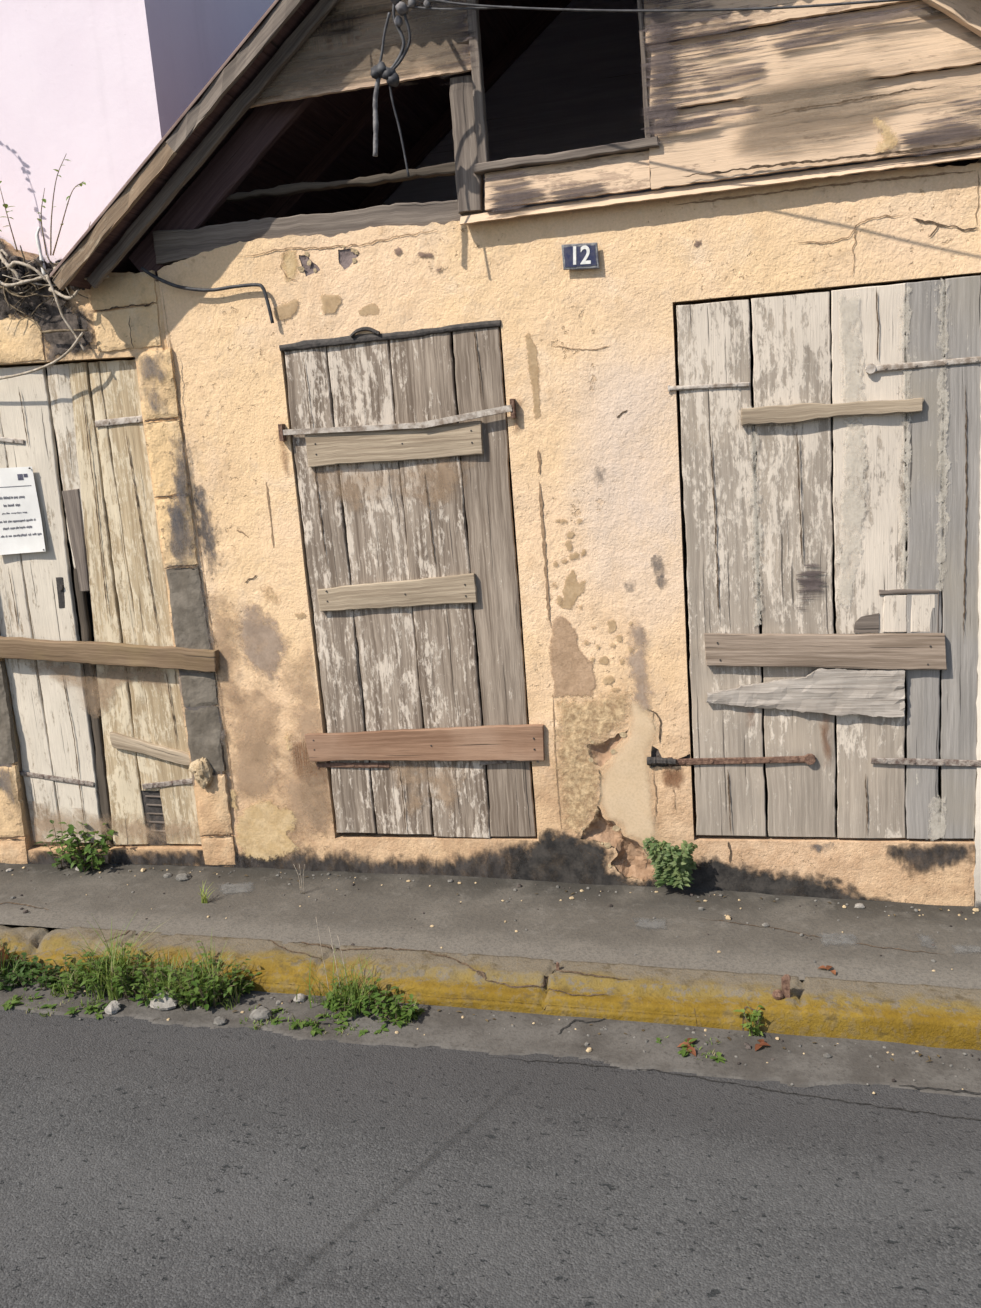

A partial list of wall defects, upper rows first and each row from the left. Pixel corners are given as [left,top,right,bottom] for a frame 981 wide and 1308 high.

crack [676,137,981,274]
peeling [549,518,655,881]
water stain [27,829,889,902]
water stain [887,843,976,872]